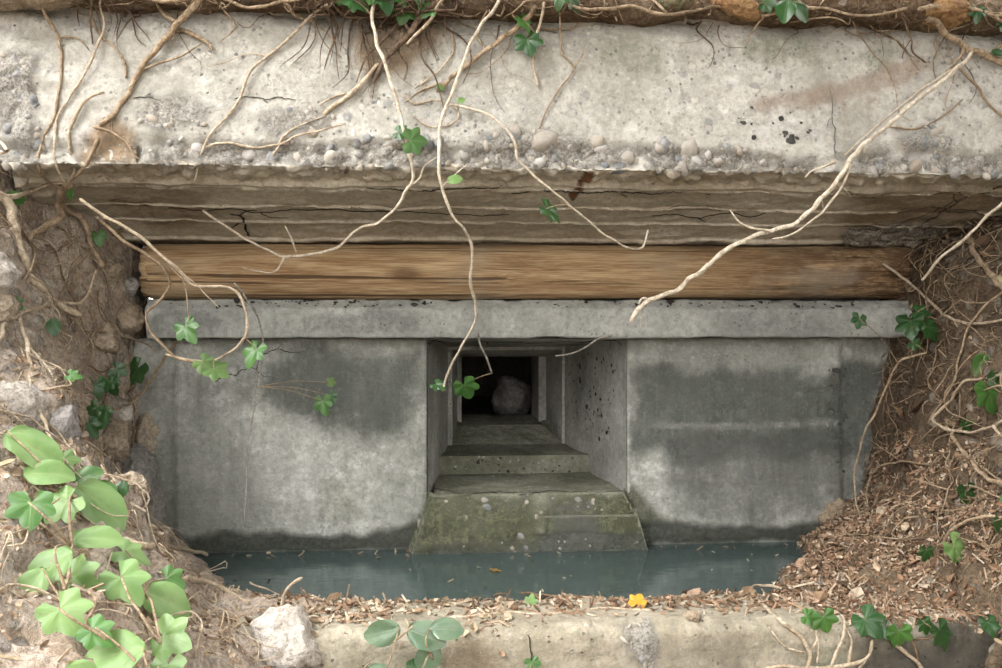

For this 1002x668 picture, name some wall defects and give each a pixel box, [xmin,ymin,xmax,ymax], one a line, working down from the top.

crack [172,185,778,237]
corrosion [569,172,594,201]
damp [267,345,414,430]
damp [175,362,882,555]